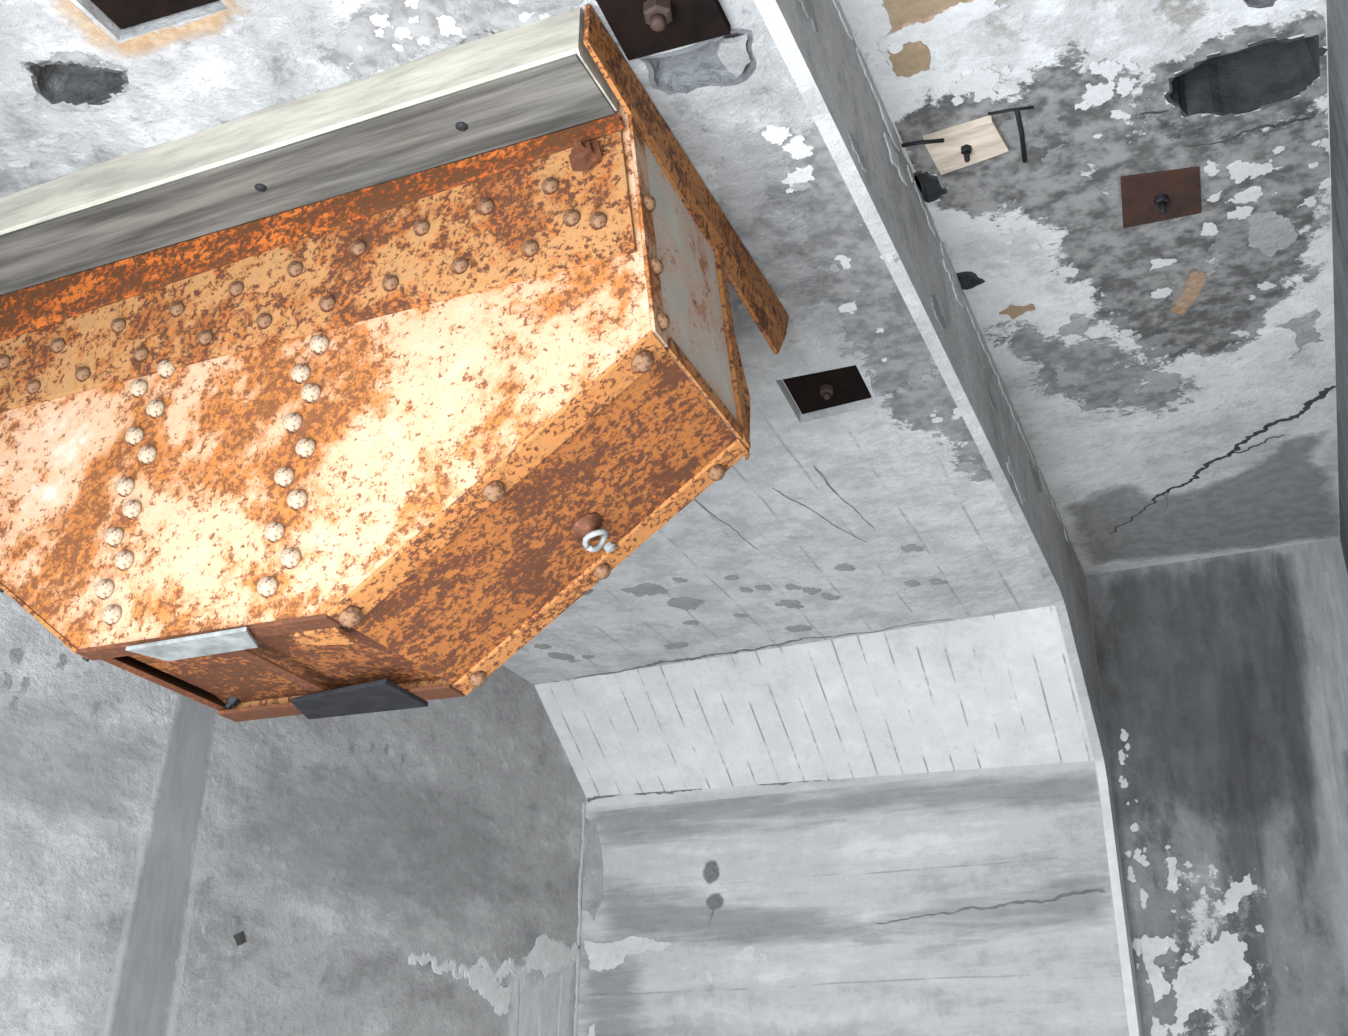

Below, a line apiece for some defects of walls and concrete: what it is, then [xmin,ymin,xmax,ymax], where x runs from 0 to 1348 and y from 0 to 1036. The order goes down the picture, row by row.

spalling [19,51,129,112]
peeling [312,0,582,78]
spalling [638,28,756,95]
peeling [761,117,994,482]
peeling [832,0,1331,542]
crack [1110,386,1336,534]
leakage [1070,437,1339,562]
peeling [621,577,705,625]
peeling [1118,729,1138,805]
leakage [704,861,723,925]
crack [875,889,1106,924]
peeling [1125,845,1287,1036]